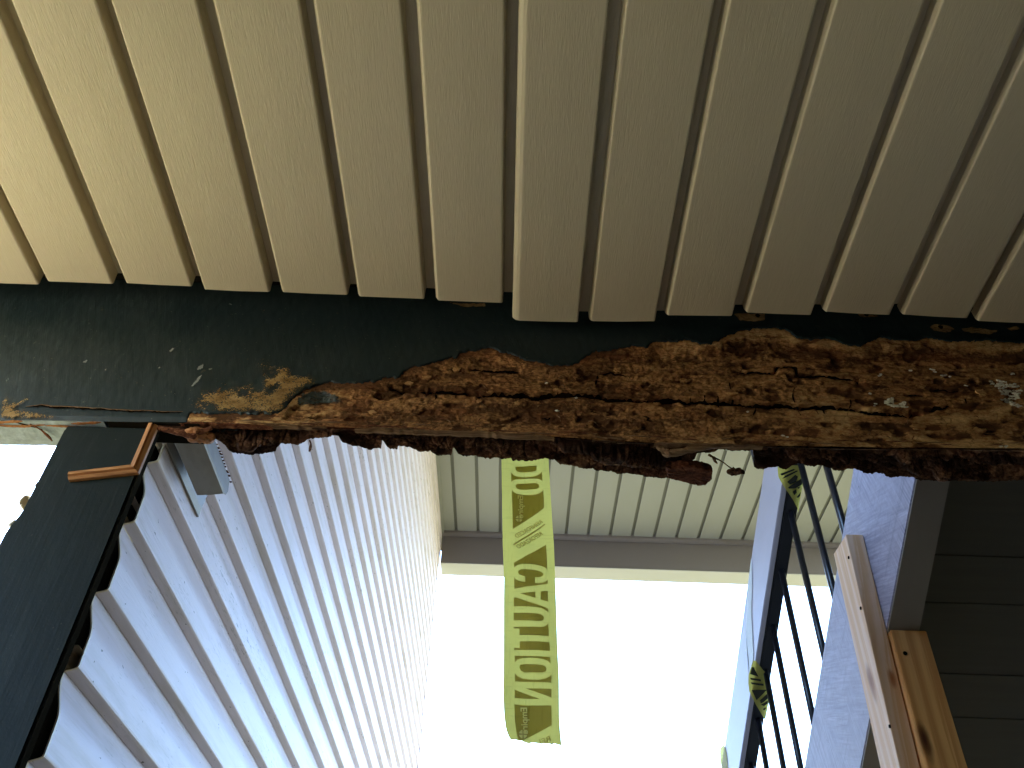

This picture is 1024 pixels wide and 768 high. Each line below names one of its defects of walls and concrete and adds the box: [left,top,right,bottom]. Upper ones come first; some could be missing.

peeling [195,362,315,413]
crack [394,366,967,422]